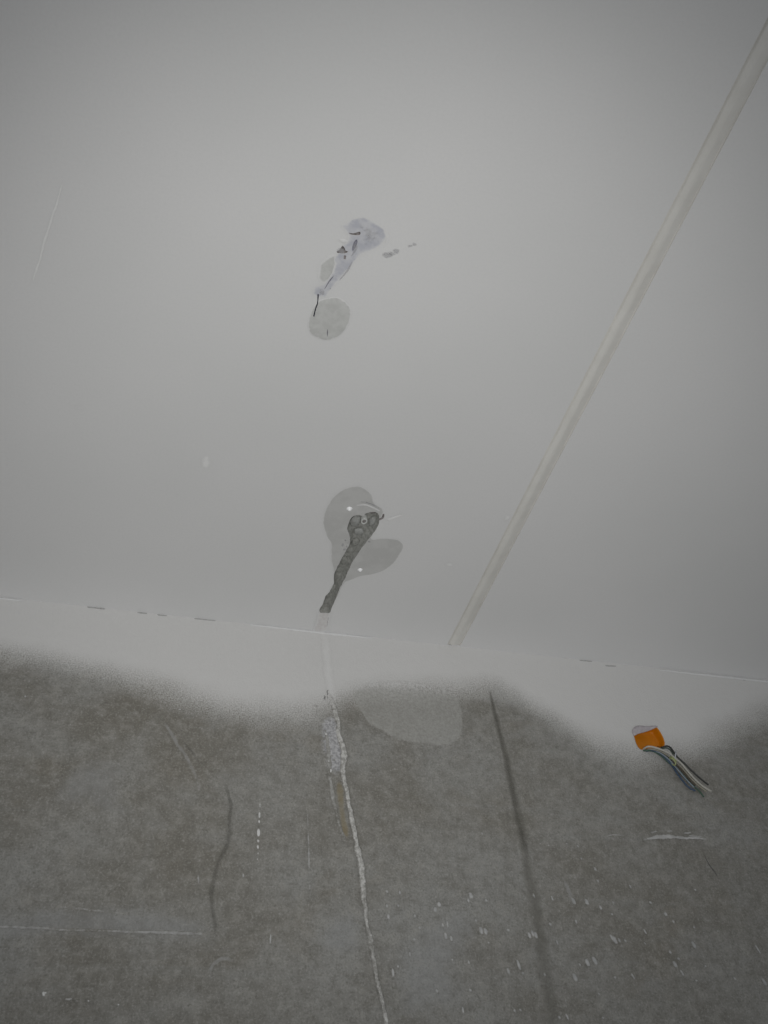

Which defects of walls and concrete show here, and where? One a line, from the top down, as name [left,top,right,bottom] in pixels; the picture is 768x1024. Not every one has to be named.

spalling [337,232,361,259]
spalling [313,504,406,632]
crack [313,634,389,1024]